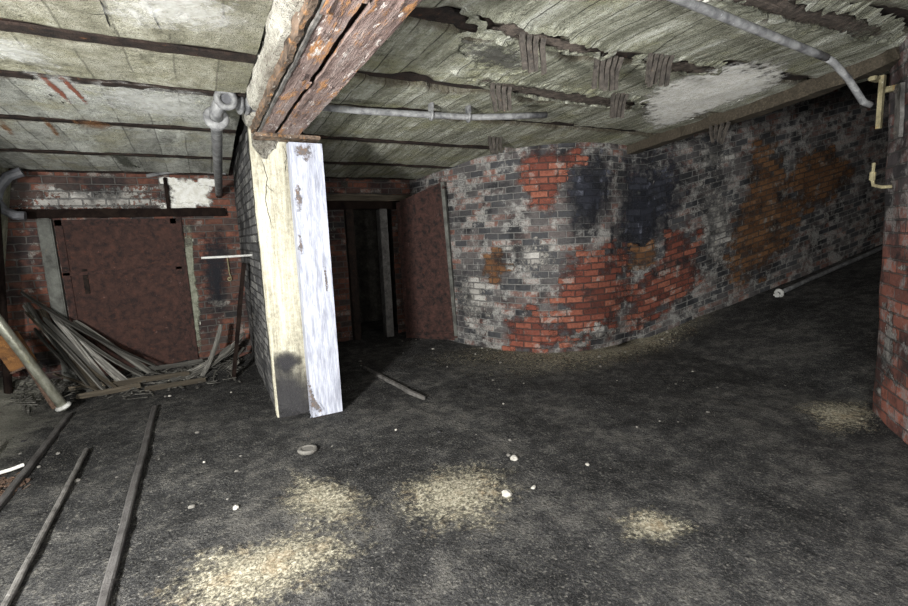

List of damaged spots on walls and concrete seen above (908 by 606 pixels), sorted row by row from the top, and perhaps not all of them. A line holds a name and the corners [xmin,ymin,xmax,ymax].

peeling [449,5,645,112]
peeling [631,54,648,71]
peeling [663,55,728,76]
rust [30,77,86,103]
peeling [488,244,516,285]